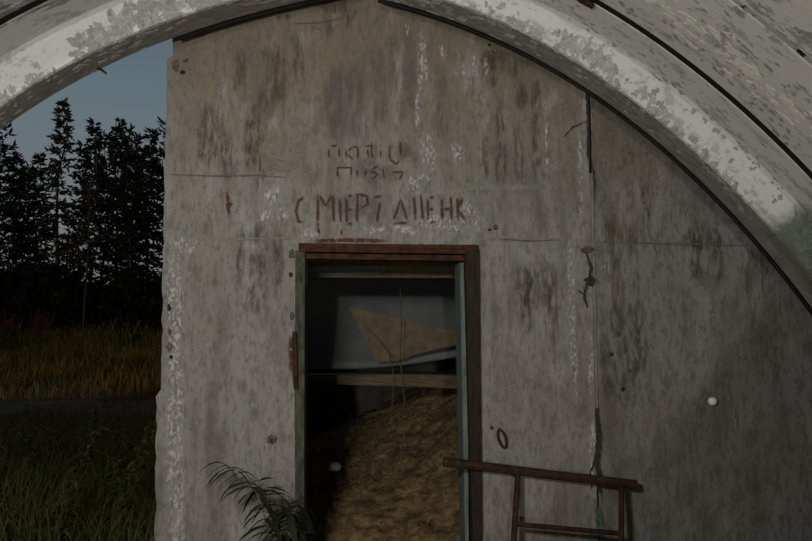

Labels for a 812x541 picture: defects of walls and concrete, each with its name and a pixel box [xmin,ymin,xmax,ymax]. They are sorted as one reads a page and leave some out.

peeling [0,0,69,28]
peeling [66,0,289,74]
peeling [0,61,64,125]
damp [415,33,428,127]
damp [408,134,436,195]
crack [564,87,596,195]
peeling [392,0,812,219]
damp [363,200,483,236]
crack [578,242,744,308]
damp [563,238,578,399]
damp [588,423,596,485]